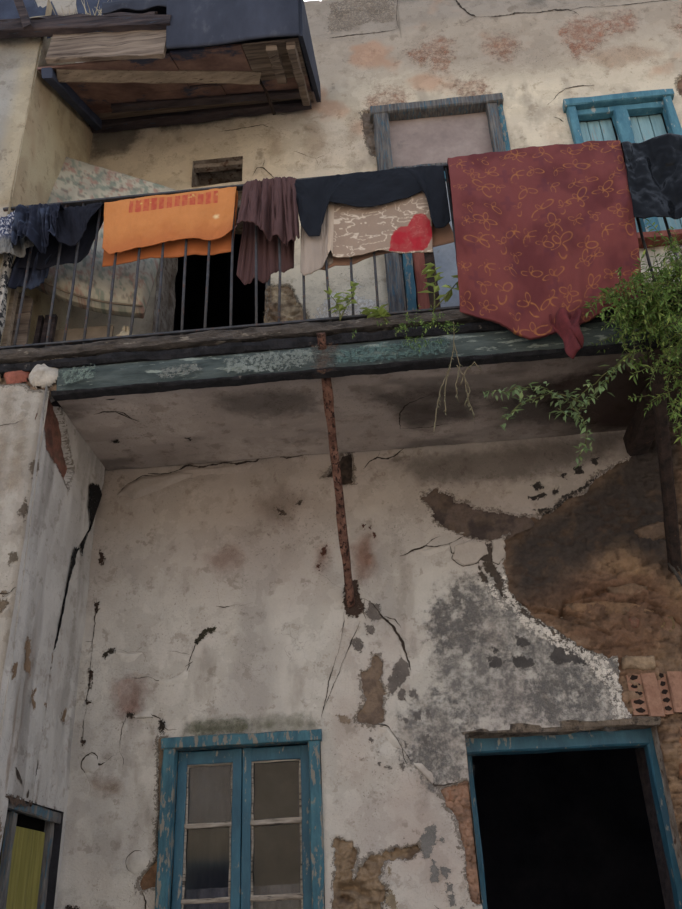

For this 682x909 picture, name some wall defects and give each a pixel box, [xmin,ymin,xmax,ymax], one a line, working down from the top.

crack [456,0,665,23]
spalling [674,74,682,97]
crack [148,459,259,479]
crack [349,395,454,468]
crack [81,599,177,791]
crack [114,629,213,685]
crack [321,598,411,716]
spalling [335,580,432,771]
leakage [398,577,620,790]
spalling [417,426,682,846]
spalling [330,777,481,909]